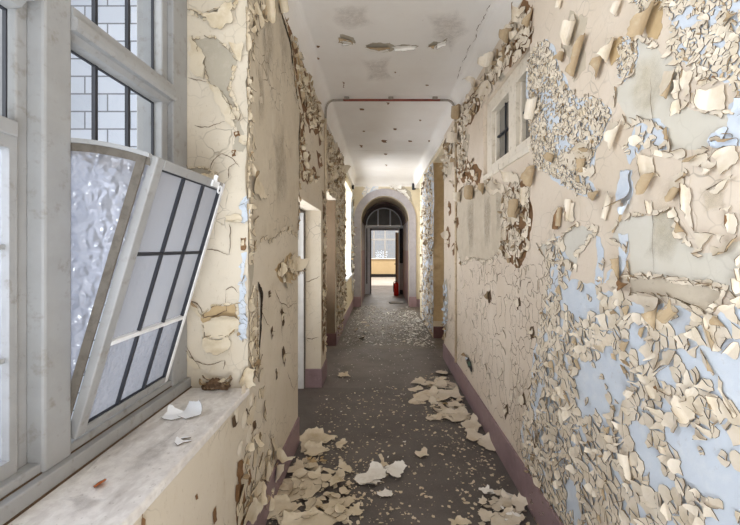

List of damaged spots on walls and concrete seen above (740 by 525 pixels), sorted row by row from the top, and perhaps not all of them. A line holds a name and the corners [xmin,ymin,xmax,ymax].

crack [258,282,296,358]
peeling [186,0,740,525]
crack [447,260,562,467]